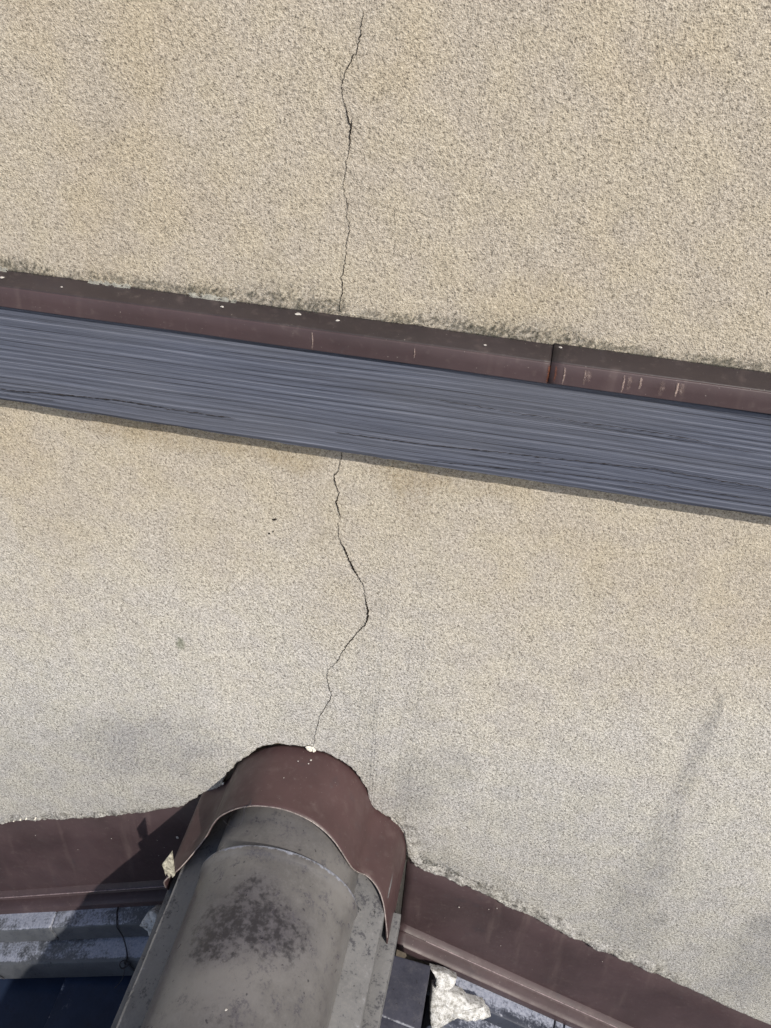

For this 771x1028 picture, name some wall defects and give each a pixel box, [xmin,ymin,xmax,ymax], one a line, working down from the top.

crack [339,9,364,314]
crack [440,400,758,454]
crack [303,432,771,752]